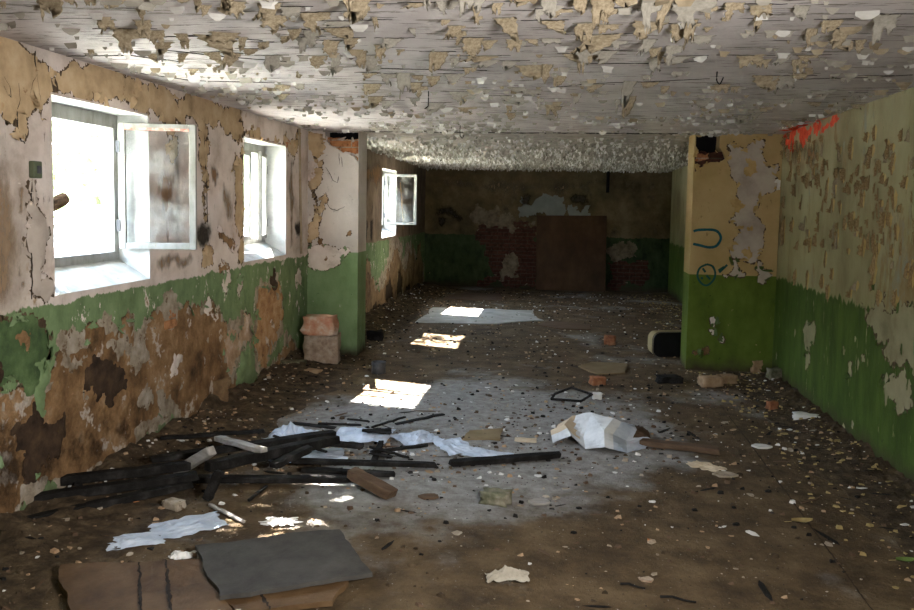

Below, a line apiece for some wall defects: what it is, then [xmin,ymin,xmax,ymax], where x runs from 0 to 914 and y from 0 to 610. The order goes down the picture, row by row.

leakage [0,426,25,496]
crack [28,253,36,299]
flaking render [0,268,297,513]
peeling [0,0,914,416]